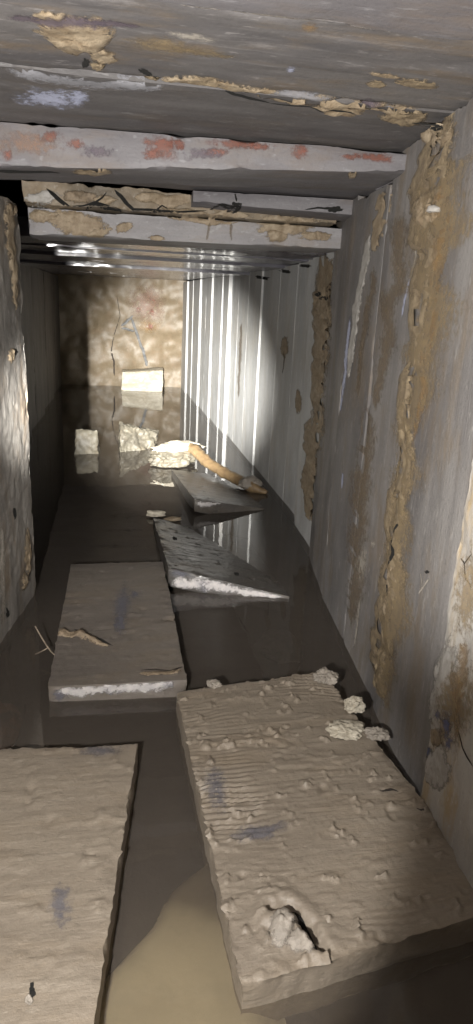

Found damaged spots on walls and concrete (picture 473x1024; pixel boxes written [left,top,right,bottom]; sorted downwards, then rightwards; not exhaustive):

peeling [30,11,65,29]
peeling [82,49,117,71]
efflorescence [11,69,160,109]
peeling [380,108,456,147]
corrosion [144,138,184,159]
corrosion [208,140,268,155]
corrosion [343,154,392,162]
spalling [9,190,117,223]
spalling [135,192,190,209]
spalling [210,194,242,214]
peeling [414,189,446,227]
flaking render [425,634,458,791]